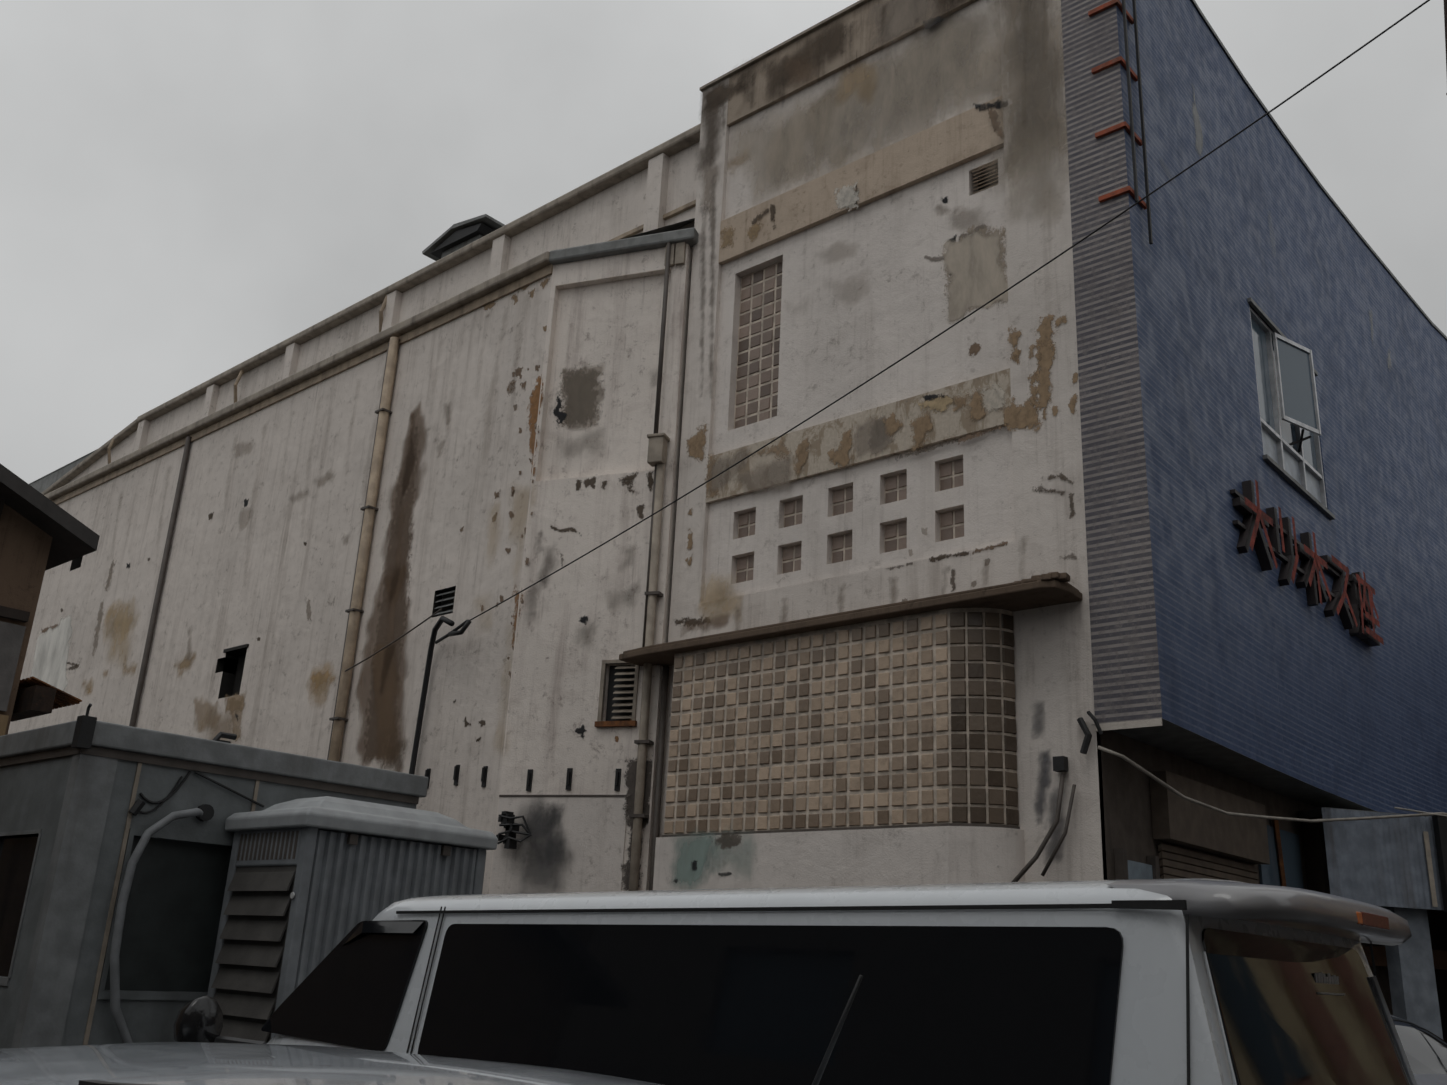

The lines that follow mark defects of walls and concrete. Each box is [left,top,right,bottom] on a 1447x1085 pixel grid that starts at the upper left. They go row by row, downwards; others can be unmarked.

leakage [768,24,844,96]
leakage [700,76,745,209]
peeling [685,314,1078,566]
leakage [226,694,244,721]
leakage [521,804,562,881]